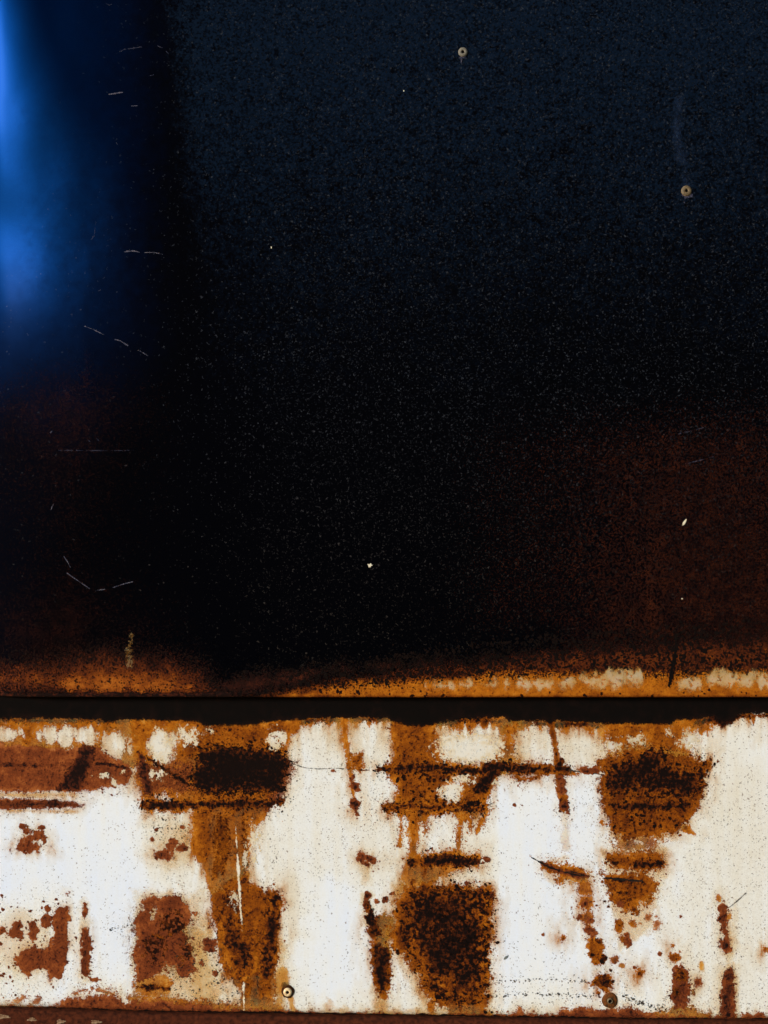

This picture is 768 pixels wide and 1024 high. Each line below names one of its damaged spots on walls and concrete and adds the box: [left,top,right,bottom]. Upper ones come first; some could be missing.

rust [0,608,768,1019]